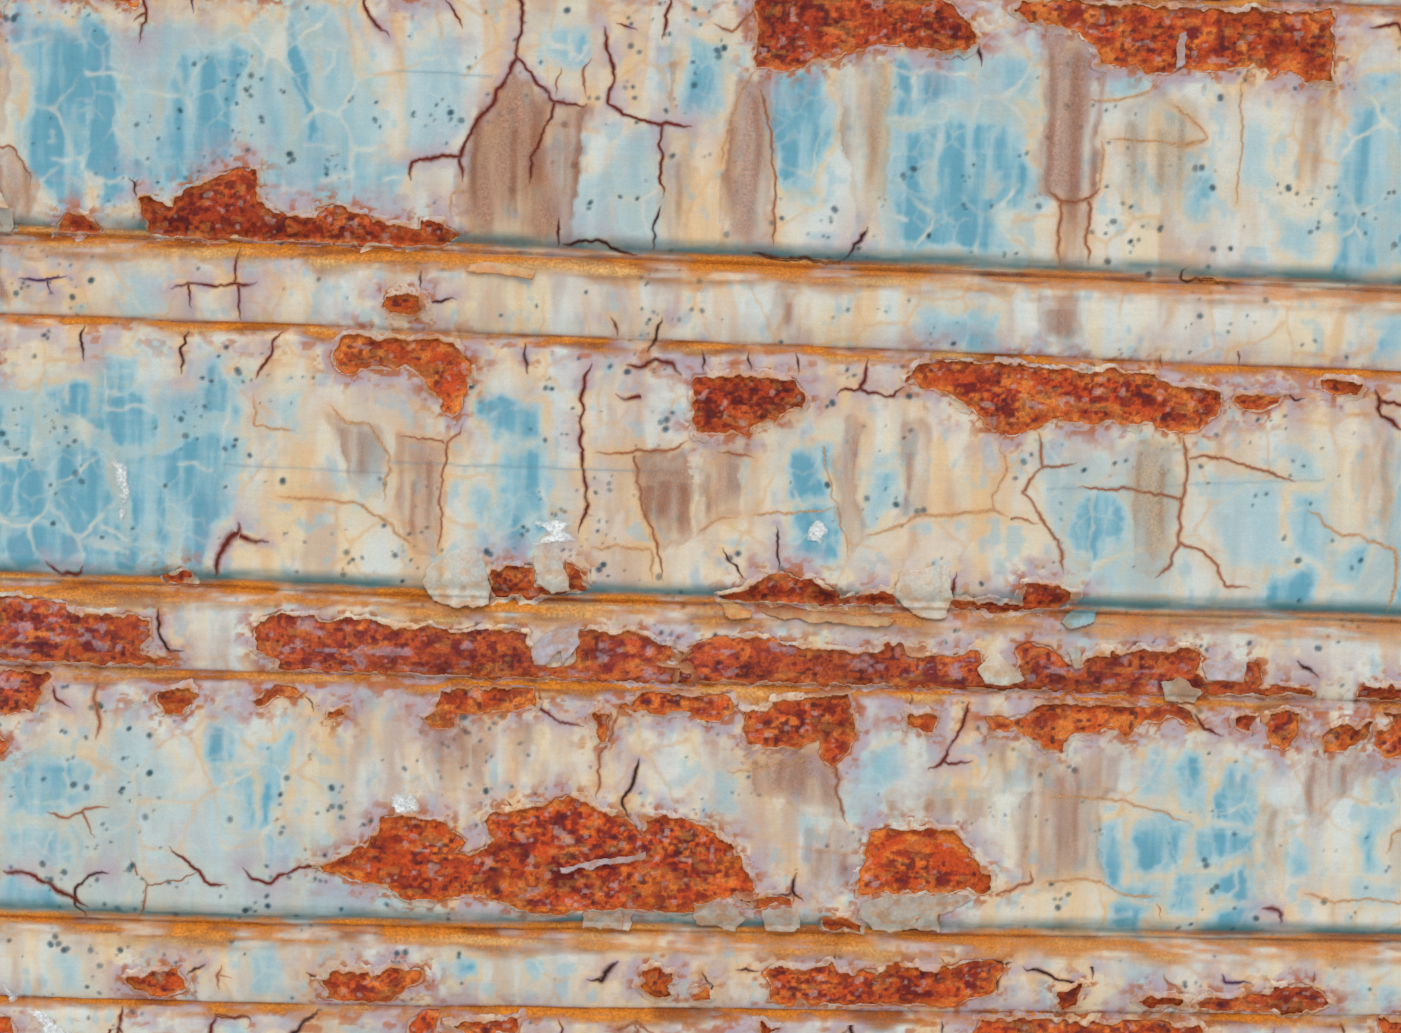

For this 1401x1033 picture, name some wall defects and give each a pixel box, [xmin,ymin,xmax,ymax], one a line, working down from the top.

crack [717,10,754,33]
crack [408,0,688,255]
corrosion [0,77,1240,294]
crack [721,73,868,264]
corrosion [0,313,339,341]
corrosion [656,340,1141,367]
crack [704,435,1293,588]
crack [1311,512,1398,608]
peeling [246,548,1401,768]
corrosion [0,910,1401,963]
corrosion [0,995,370,1017]
corrosion [439,1006,956,1029]